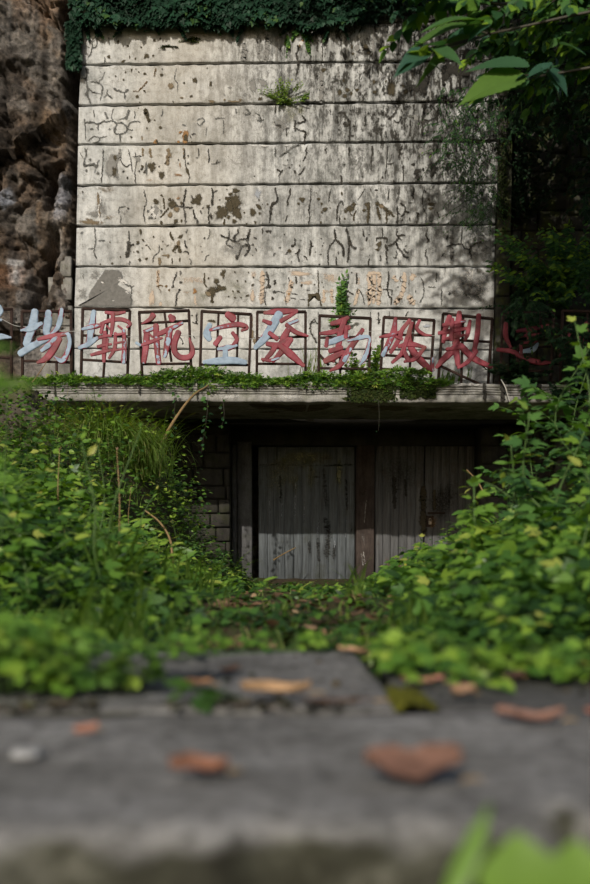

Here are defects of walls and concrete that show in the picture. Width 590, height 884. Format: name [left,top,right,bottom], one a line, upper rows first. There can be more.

crack [80,37,178,305]
crack [152,66,482,345]